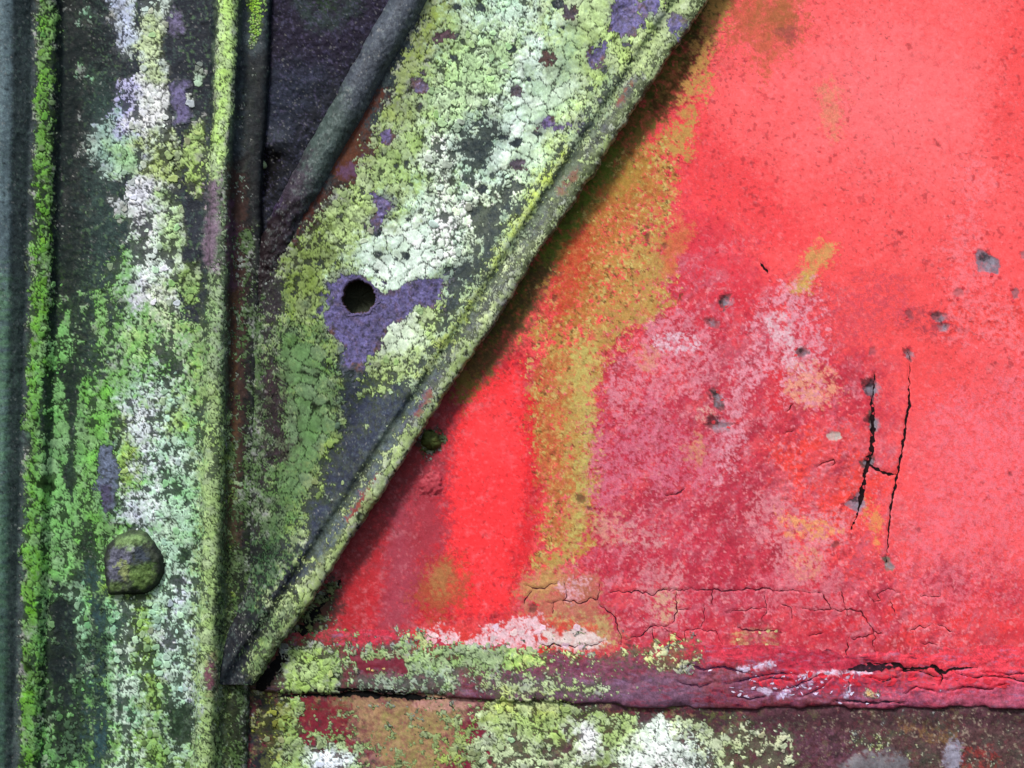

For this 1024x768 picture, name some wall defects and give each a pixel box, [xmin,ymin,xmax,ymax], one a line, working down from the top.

peeling [972,248,1003,279]
crack [851,352,911,562]
crack [524,583,1024,705]
peeling [730,658,1017,704]